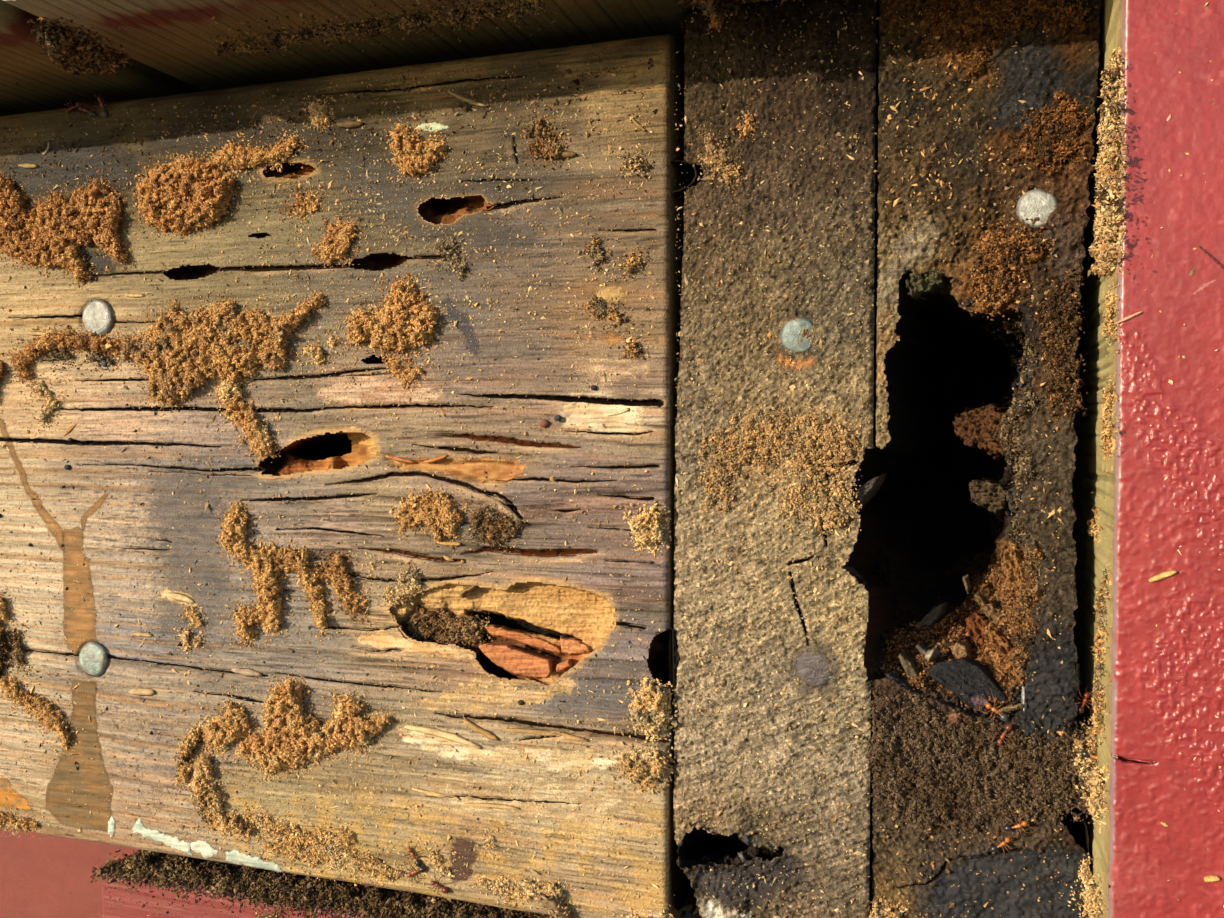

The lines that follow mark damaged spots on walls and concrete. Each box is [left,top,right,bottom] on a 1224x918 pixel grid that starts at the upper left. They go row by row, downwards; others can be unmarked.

crack [0,359,661,582]
crack [787,460,857,646]
peeling [738,835,753,863]